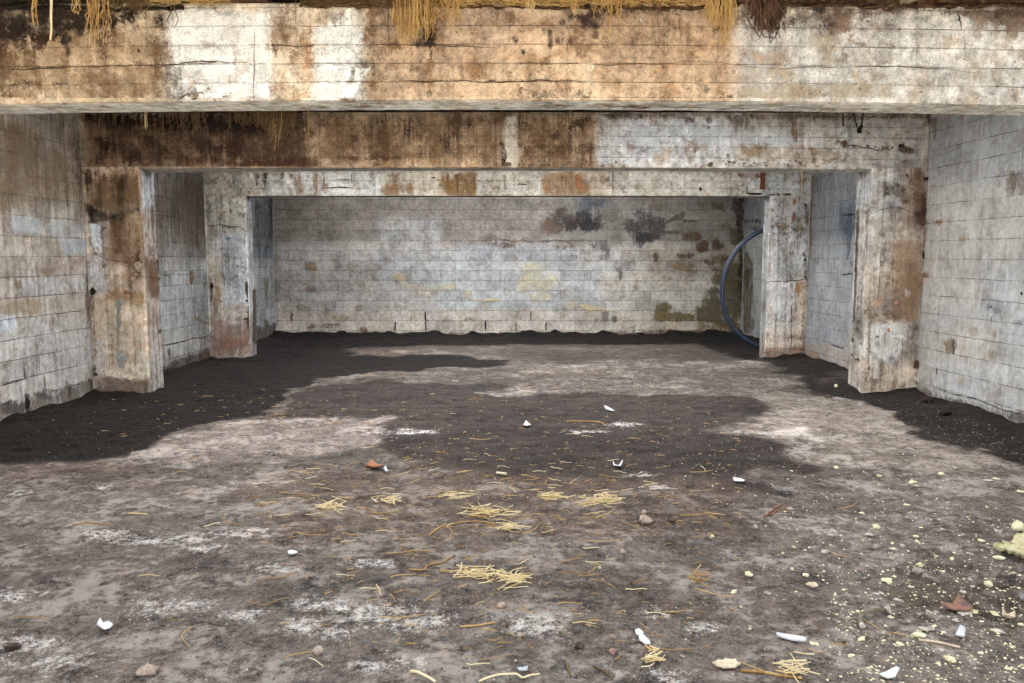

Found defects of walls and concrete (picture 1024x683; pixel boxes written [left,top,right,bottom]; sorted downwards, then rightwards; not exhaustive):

leakage [0,29,47,97]
leakage [96,13,137,64]
leakage [106,231,160,331]
leakage [66,112,617,260]
leakage [580,198,761,335]
leakage [884,167,928,320]